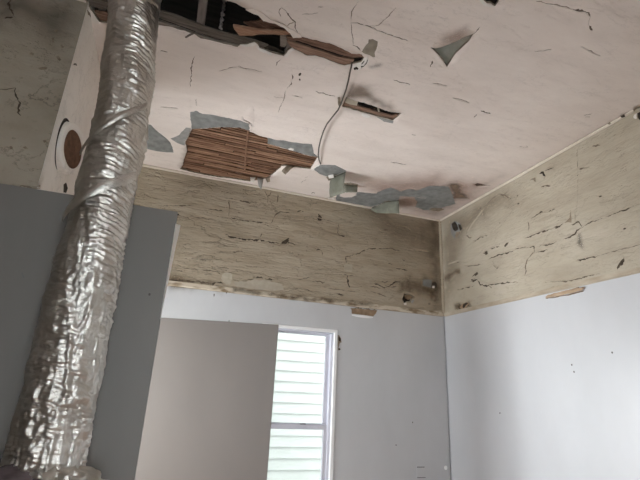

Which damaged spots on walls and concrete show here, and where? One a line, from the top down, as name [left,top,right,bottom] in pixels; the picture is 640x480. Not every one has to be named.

spalling [87,0,108,21]
spalling [158,8,378,65]
crack [351,2,406,50]
peeling [428,27,480,68]
crack [537,1,593,30]
crack [2,88,21,116]
crack [277,73,333,110]
flaking render [147,109,456,213]
crack [150,177,347,253]
crack [447,194,640,291]
crack [169,256,227,296]
crack [289,245,429,297]